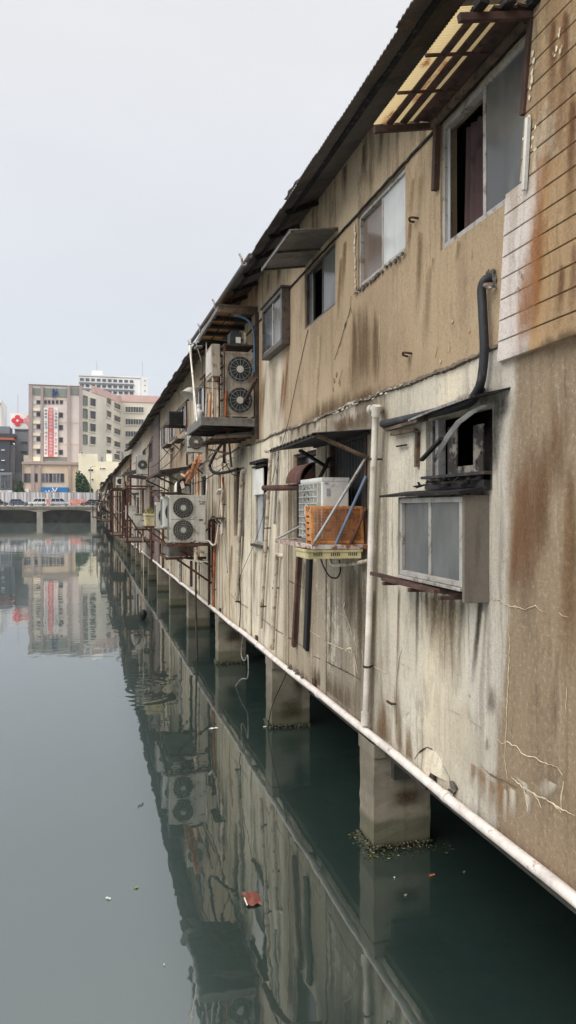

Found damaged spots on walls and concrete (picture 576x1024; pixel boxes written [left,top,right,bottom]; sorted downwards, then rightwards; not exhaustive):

rust [550,12,567,62]
damp [352,322,378,368]
damp [416,592,463,628]
damp [475,604,485,649]
crack [446,597,575,816]